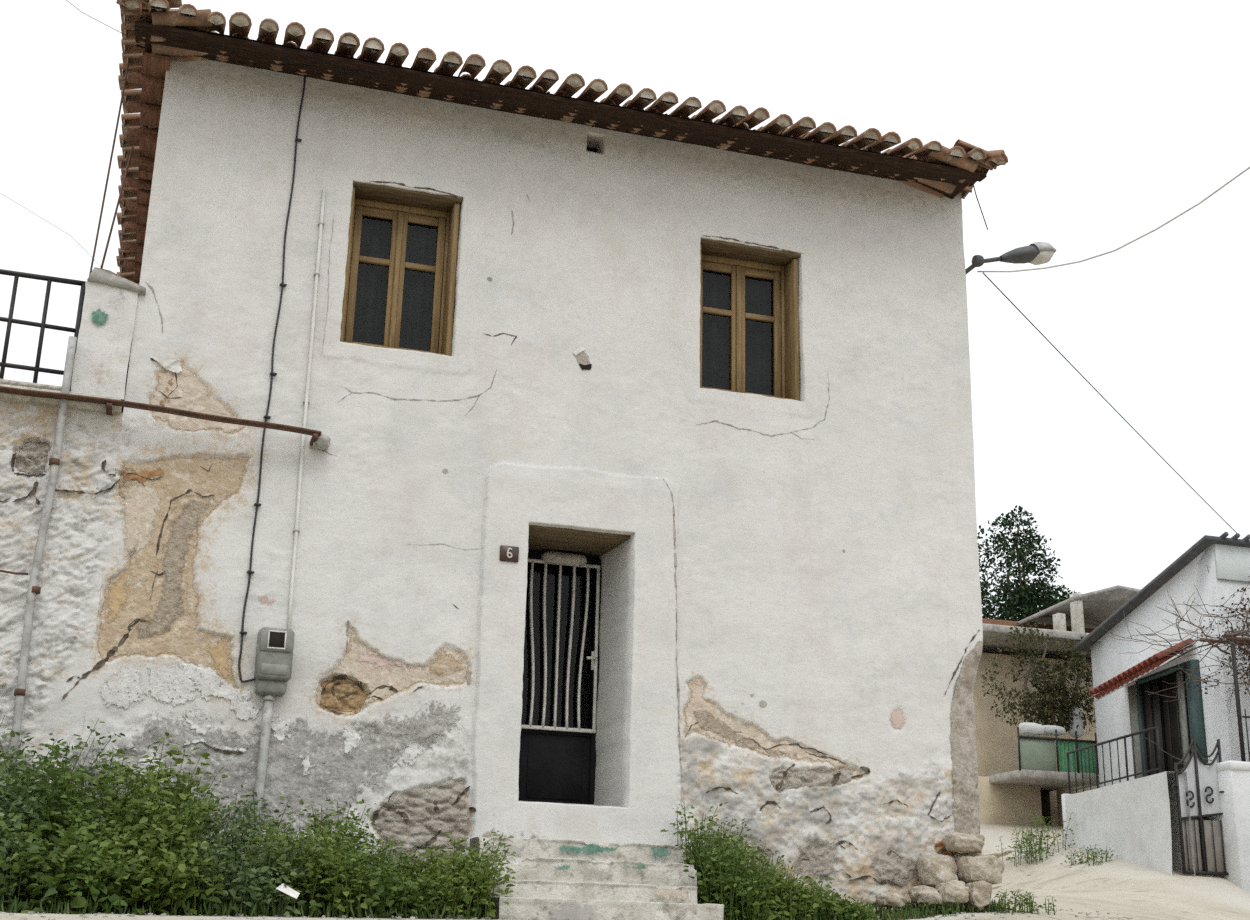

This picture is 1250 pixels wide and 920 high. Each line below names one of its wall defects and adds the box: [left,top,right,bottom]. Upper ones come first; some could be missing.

peeling [149,355,245,434]
crack [338,333,517,411]
crack [696,387,830,439]
flaking render [11,442,50,477]
peeling [69,456,476,868]
peeling [685,678,871,792]
flaking render [691,831,771,868]
flaking render [795,834,852,879]